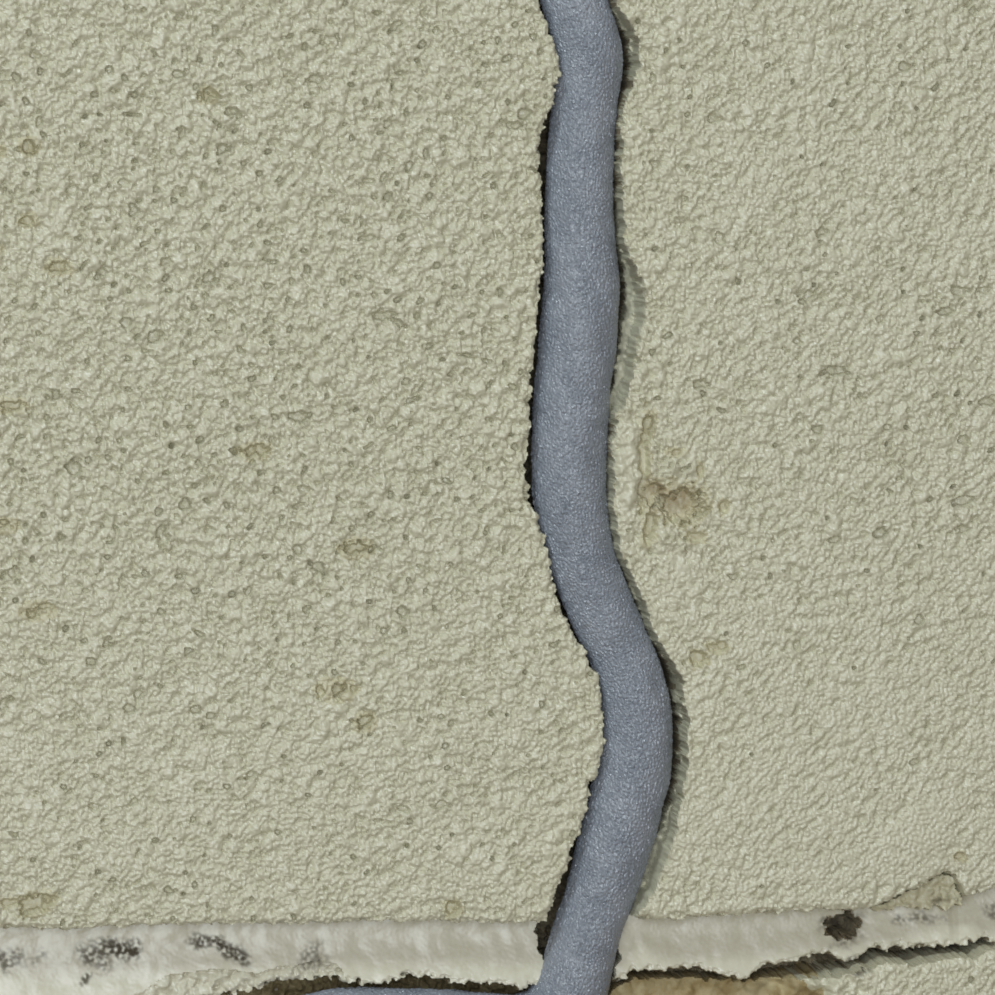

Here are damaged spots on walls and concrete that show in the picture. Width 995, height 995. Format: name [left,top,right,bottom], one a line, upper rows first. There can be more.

crack [608,0,633,349]
crack [523,109,551,534]
crack [606,423,615,488]
crack [551,575,598,673]
crack [620,566,682,832]
crack [535,837,577,958]
mould [82,941,138,983]
mould [194,936,248,965]
spalling [135,959,348,995]
crack [220,973,531,995]
spalling [608,961,824,995]
crack [609,937,995,990]